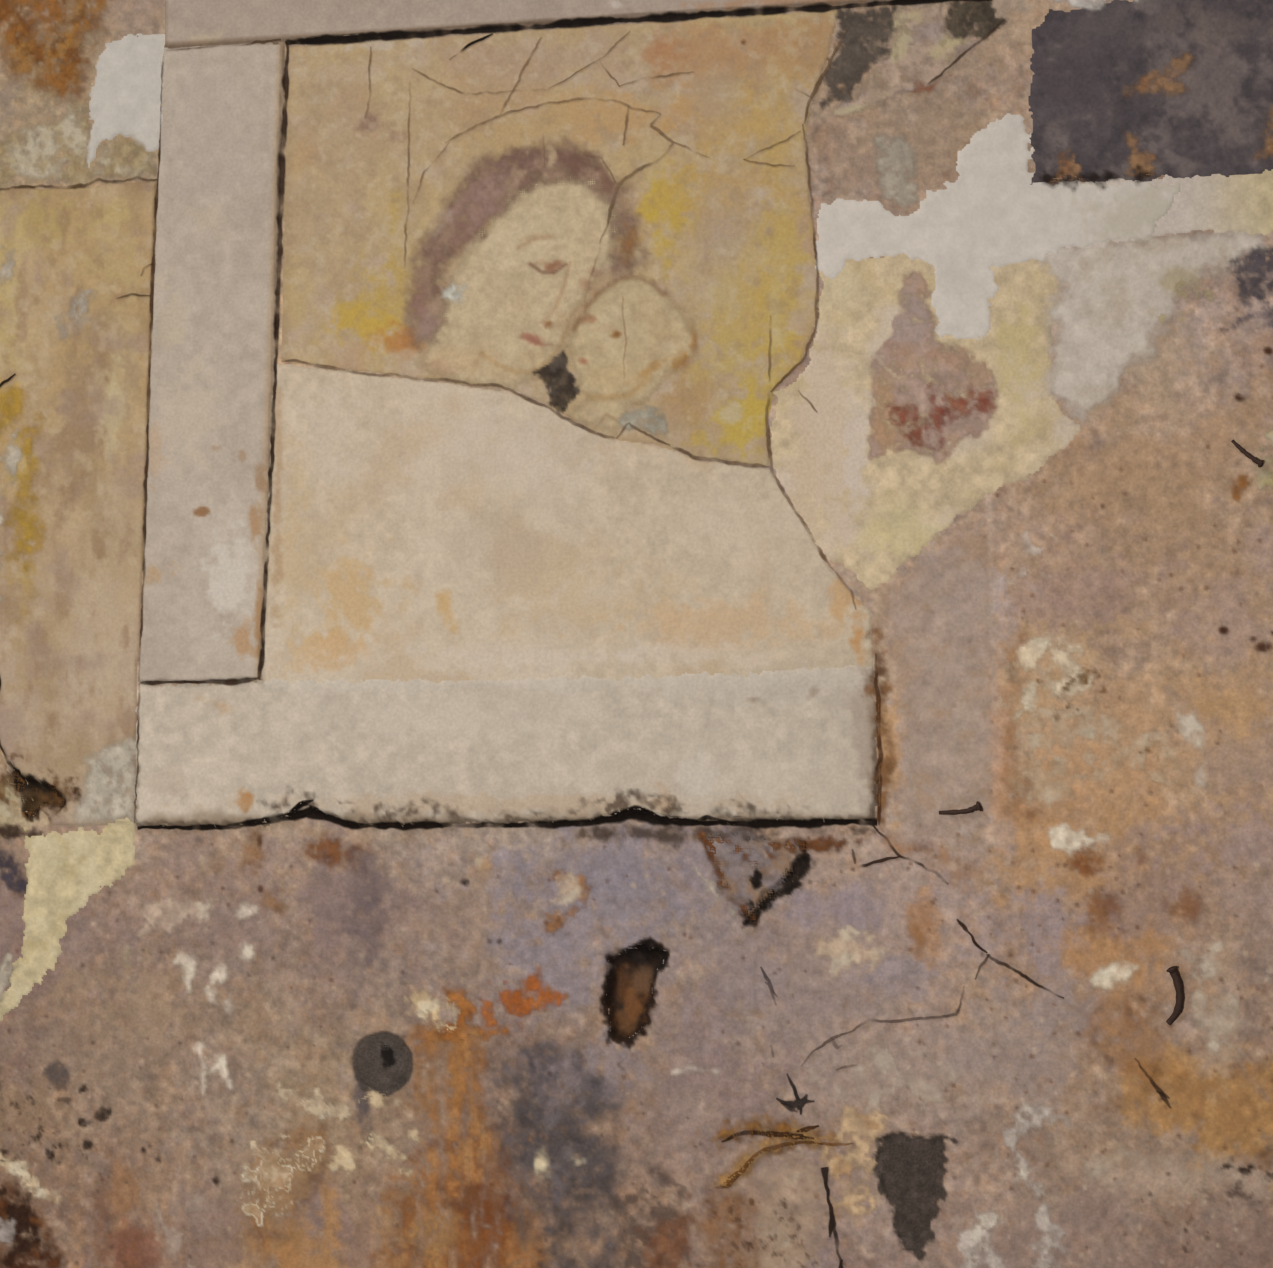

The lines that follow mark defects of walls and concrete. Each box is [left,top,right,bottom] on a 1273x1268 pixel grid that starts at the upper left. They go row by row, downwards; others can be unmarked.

corrosion [0,0,105,96]
flaking render [833,2,979,116]
crack [0,47,202,643]
crack [143,0,1005,685]
peeling [770,111,1273,590]
peeling [0,180,159,1021]
crack [134,654,923,867]
spalling [600,938,669,1048]
corrosion [0,1181,61,1268]
corrosion [392,975,566,1268]
crack [721,1073,848,1268]
spalling [820,1106,956,1260]